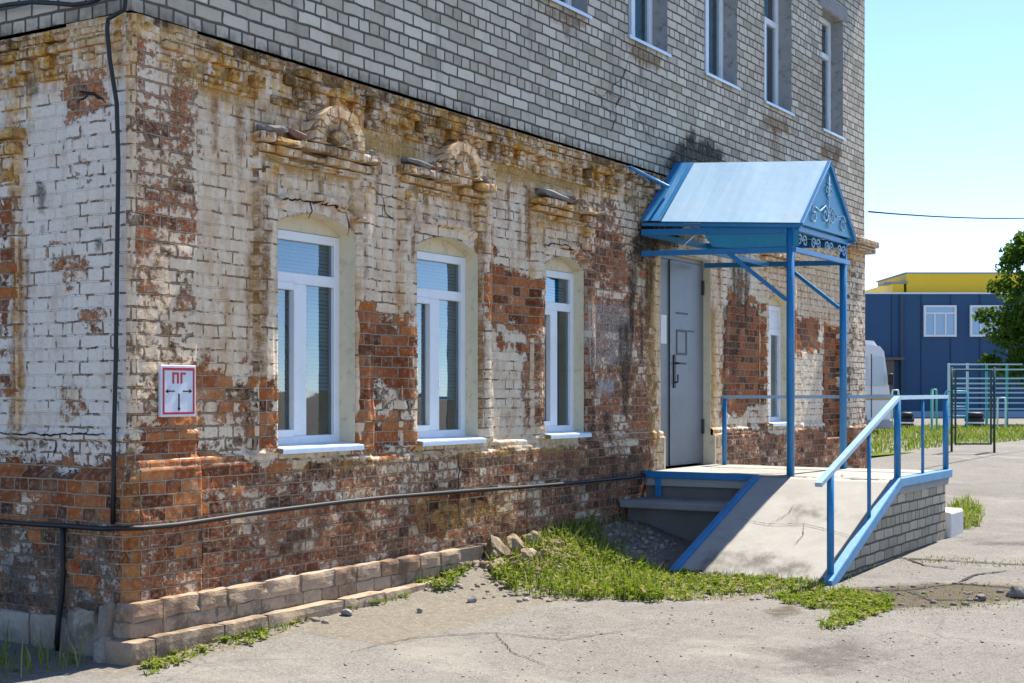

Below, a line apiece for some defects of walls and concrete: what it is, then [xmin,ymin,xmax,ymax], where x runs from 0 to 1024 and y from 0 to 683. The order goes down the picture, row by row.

peeling [0,196,22,358]
crack [0,432,105,456]
peeling [45,241,91,293]
peeling [59,58,110,173]
peeling [0,348,292,560]
peeling [137,281,162,297]
peeling [136,37,209,264]
crack [283,198,350,236]
peeling [354,301,419,469]
peeling [478,247,546,433]
peeling [719,280,769,422]
peeling [795,310,838,437]